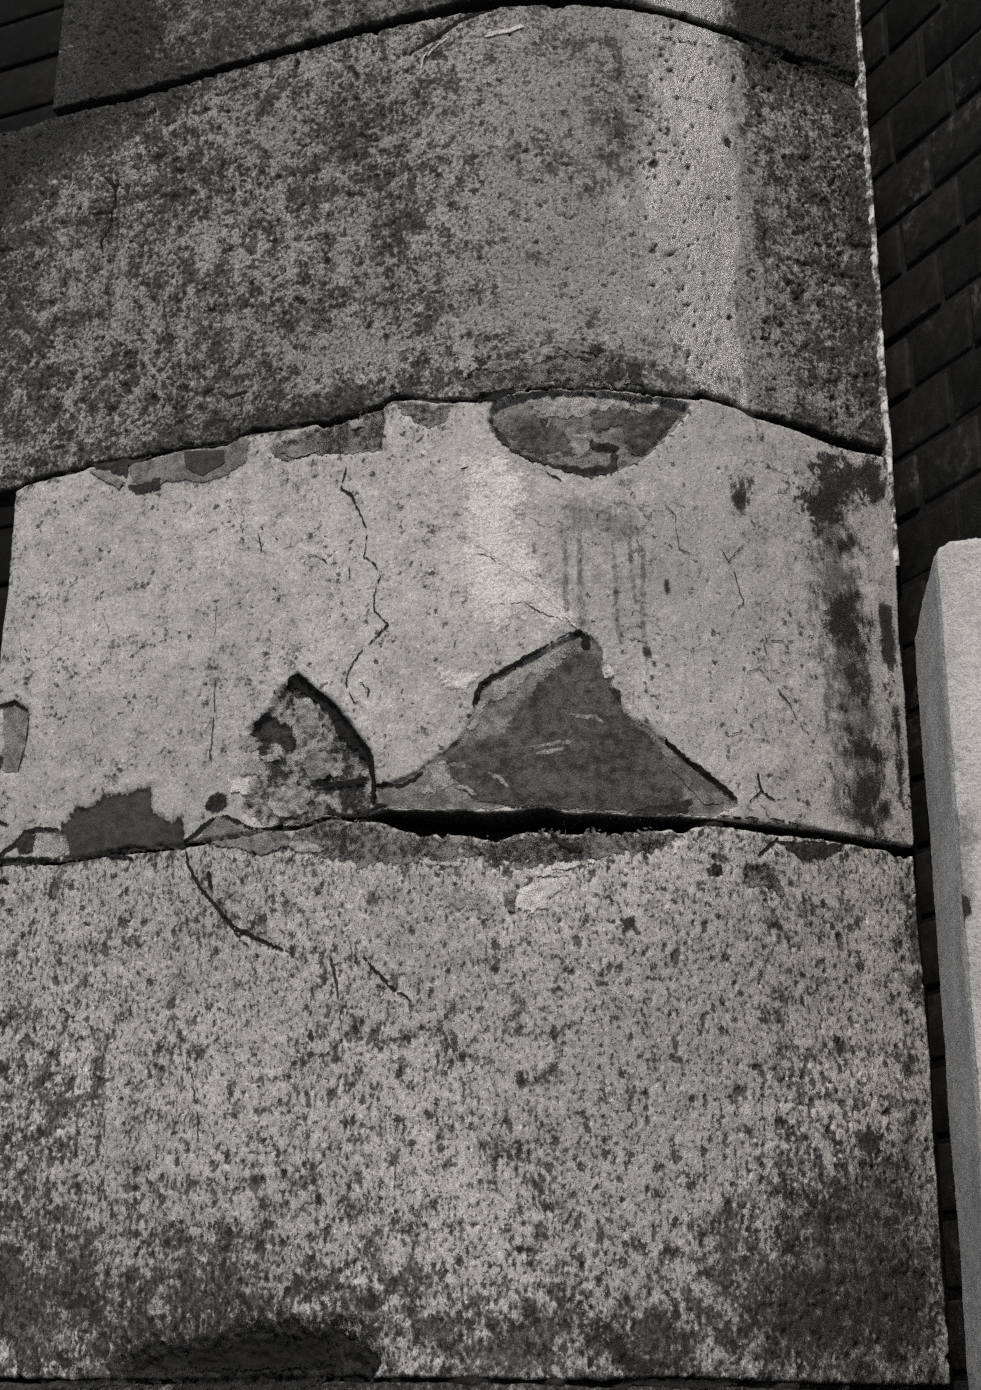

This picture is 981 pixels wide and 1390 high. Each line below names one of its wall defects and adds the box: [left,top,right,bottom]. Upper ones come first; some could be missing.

spalling [447,339,691,478]
water stain [727,474,755,510]
crack [257,456,389,703]
water stain [782,445,906,846]
spalling [0,629,739,921]
crack [185,849,292,955]
spalling [743,862,784,898]
spalling [785,841,843,860]
crack [306,954,412,1064]